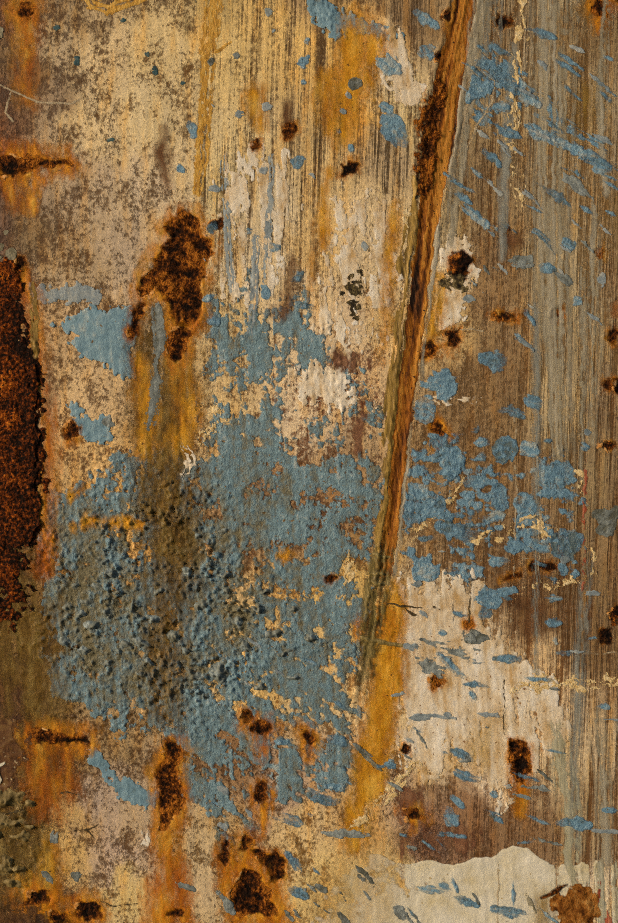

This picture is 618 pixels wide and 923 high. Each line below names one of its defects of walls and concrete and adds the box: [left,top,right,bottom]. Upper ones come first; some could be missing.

peeling [306,0,427,113]
corrosion [124,204,215,459]
peeling [419,232,481,361]
corrosion [428,249,473,337]
spalling [605,329,618,346]
corrosion [0,257,58,634]
peeling [37,122,412,851]
peeling [346,418,618,831]
corrosion [143,736,192,923]
corrosion [214,832,288,923]
peeling [311,846,617,923]
corrosion [540,884,601,923]